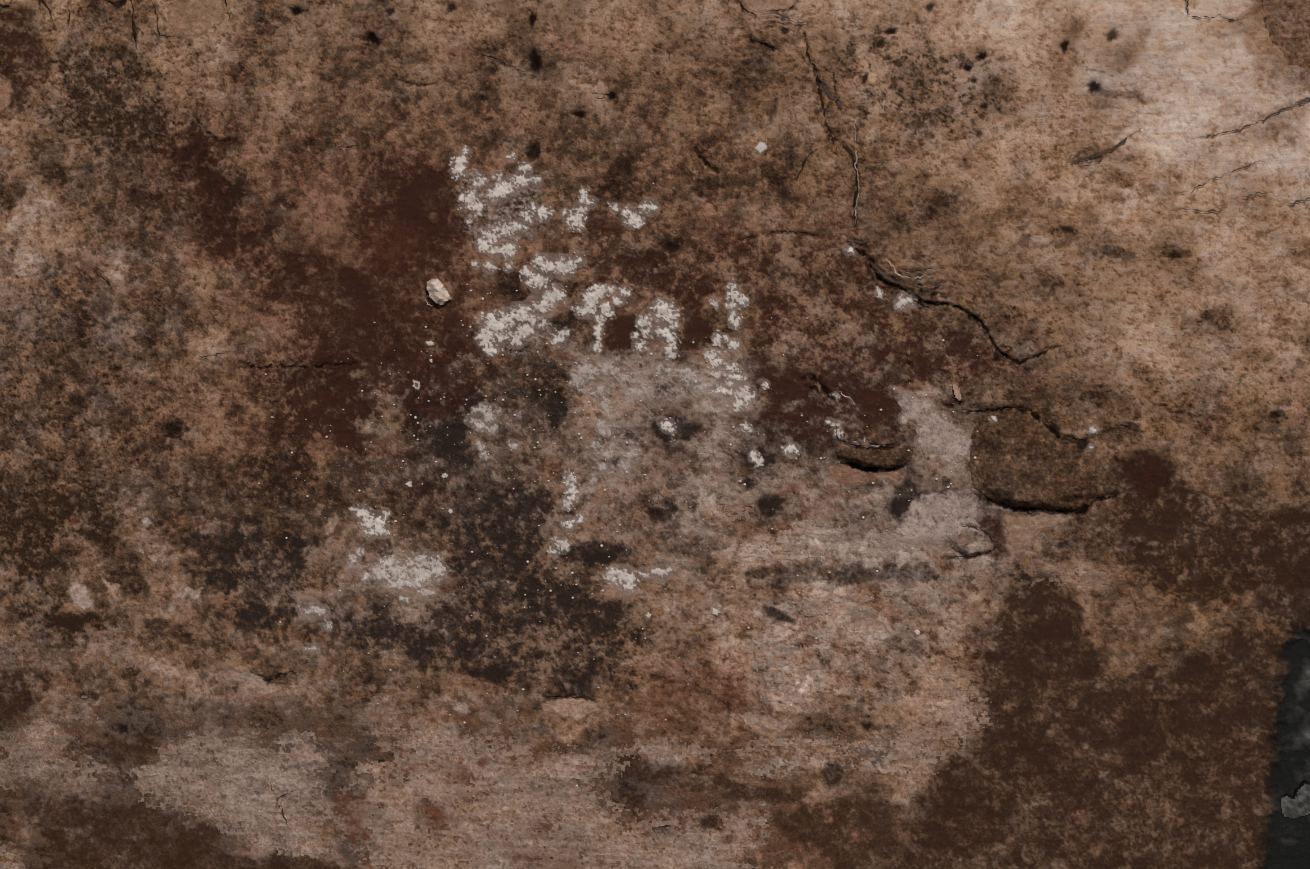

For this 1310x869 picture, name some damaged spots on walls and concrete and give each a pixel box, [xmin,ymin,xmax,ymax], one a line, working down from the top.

damp [0,9,1013,479]
crack [731,0,1055,365]
crack [1170,160,1310,212]
crack [1190,97,1310,140]
damp [181,472,672,698]
damp [617,450,1310,869]